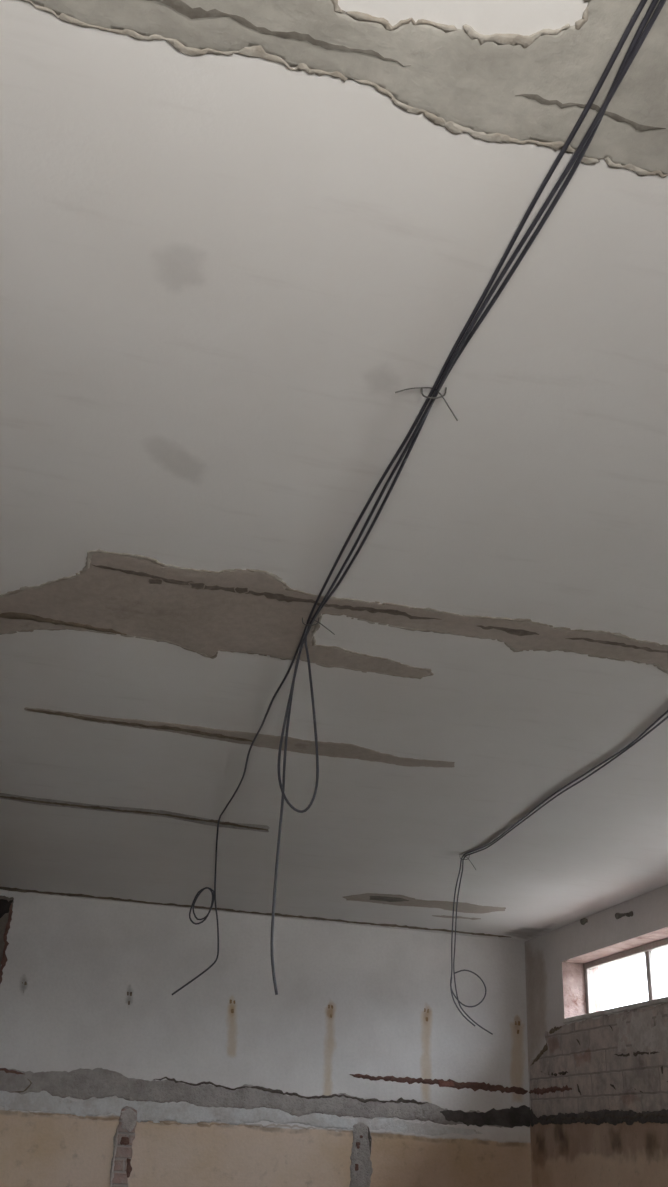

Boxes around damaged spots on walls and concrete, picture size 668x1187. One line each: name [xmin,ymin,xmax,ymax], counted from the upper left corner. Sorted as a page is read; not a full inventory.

flaking render [21,0,668,178]
flaking render [0,549,668,679]
flaking render [24,707,455,768]
flaking render [0,793,270,832]
flaking render [343,893,506,920]
corrosion [318,997,339,1096]
flaking render [530,1002,668,1117]
peeling [0,1091,499,1149]
damp [369,1117,668,1187]